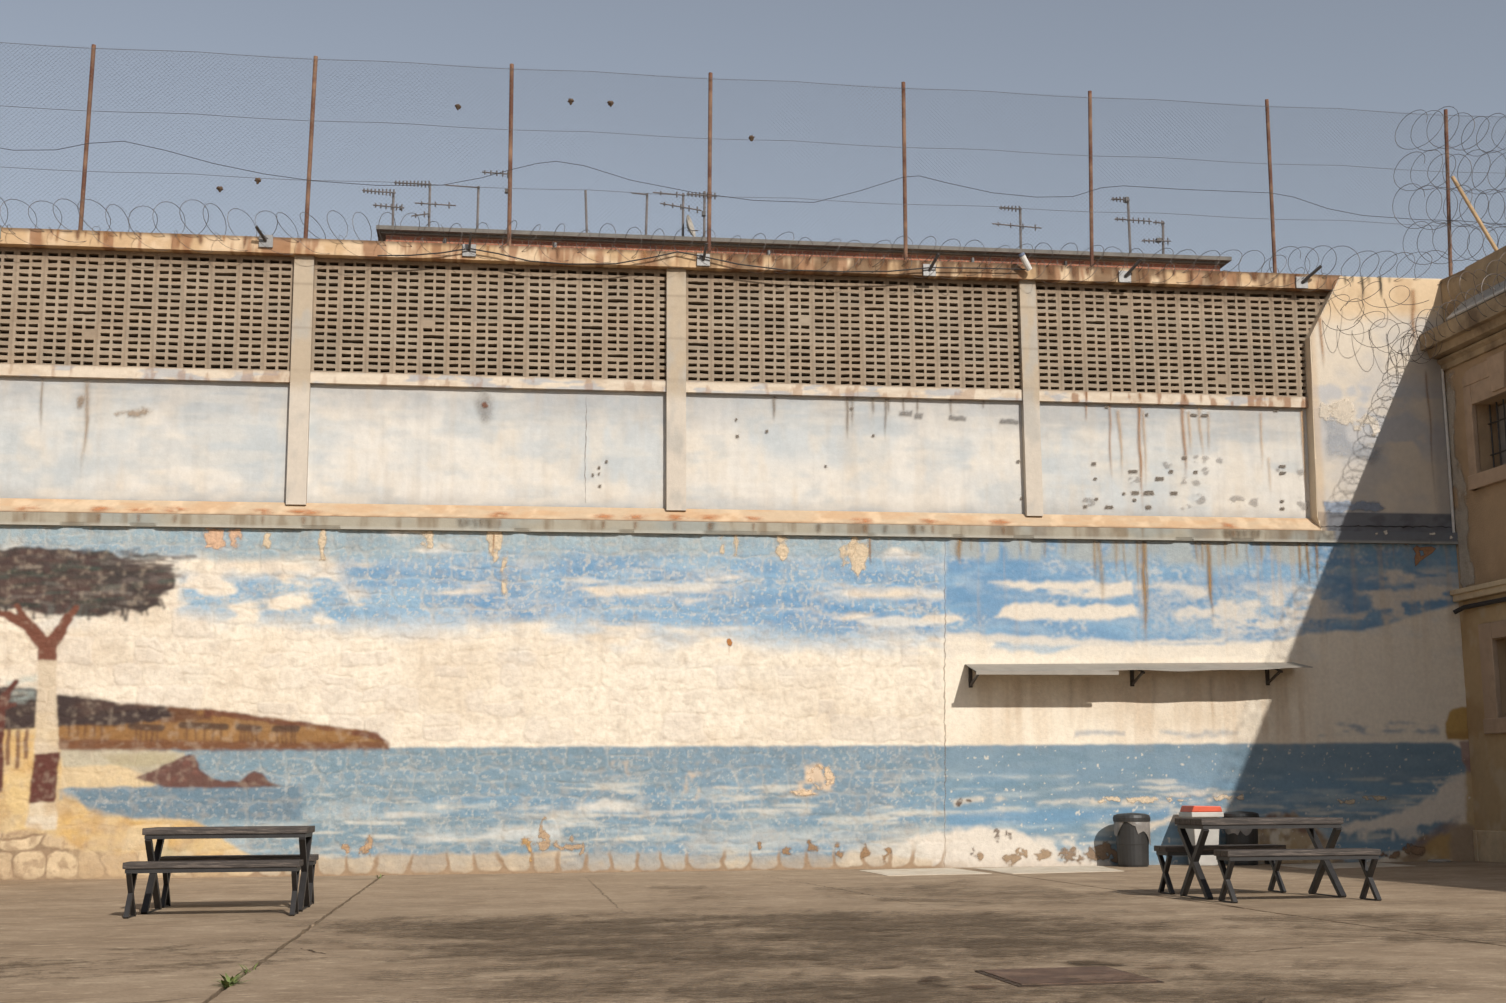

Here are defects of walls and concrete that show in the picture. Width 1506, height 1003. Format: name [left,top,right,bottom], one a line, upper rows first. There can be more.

peeling [1320,399,1380,436]
spalling [1084,455,1221,509]
peeling [839,537,871,576]
rust [1202,543,1212,600]
peeling [791,764,835,796]
flaking render [0,817,933,880]
spalling [994,828,1118,866]